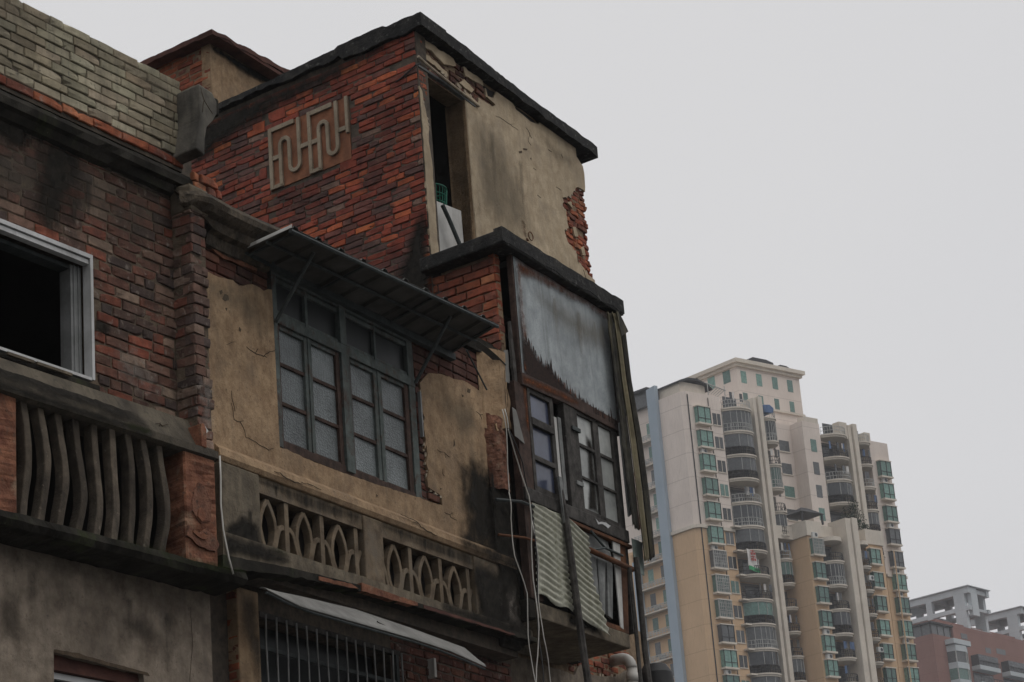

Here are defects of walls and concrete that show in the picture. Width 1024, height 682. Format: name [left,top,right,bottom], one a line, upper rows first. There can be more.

spalling [415,40,492,106]
spalling [561,188,593,278]
crack [231,391,321,490]
spalling [484,413,511,493]
damp [387,461,533,651]